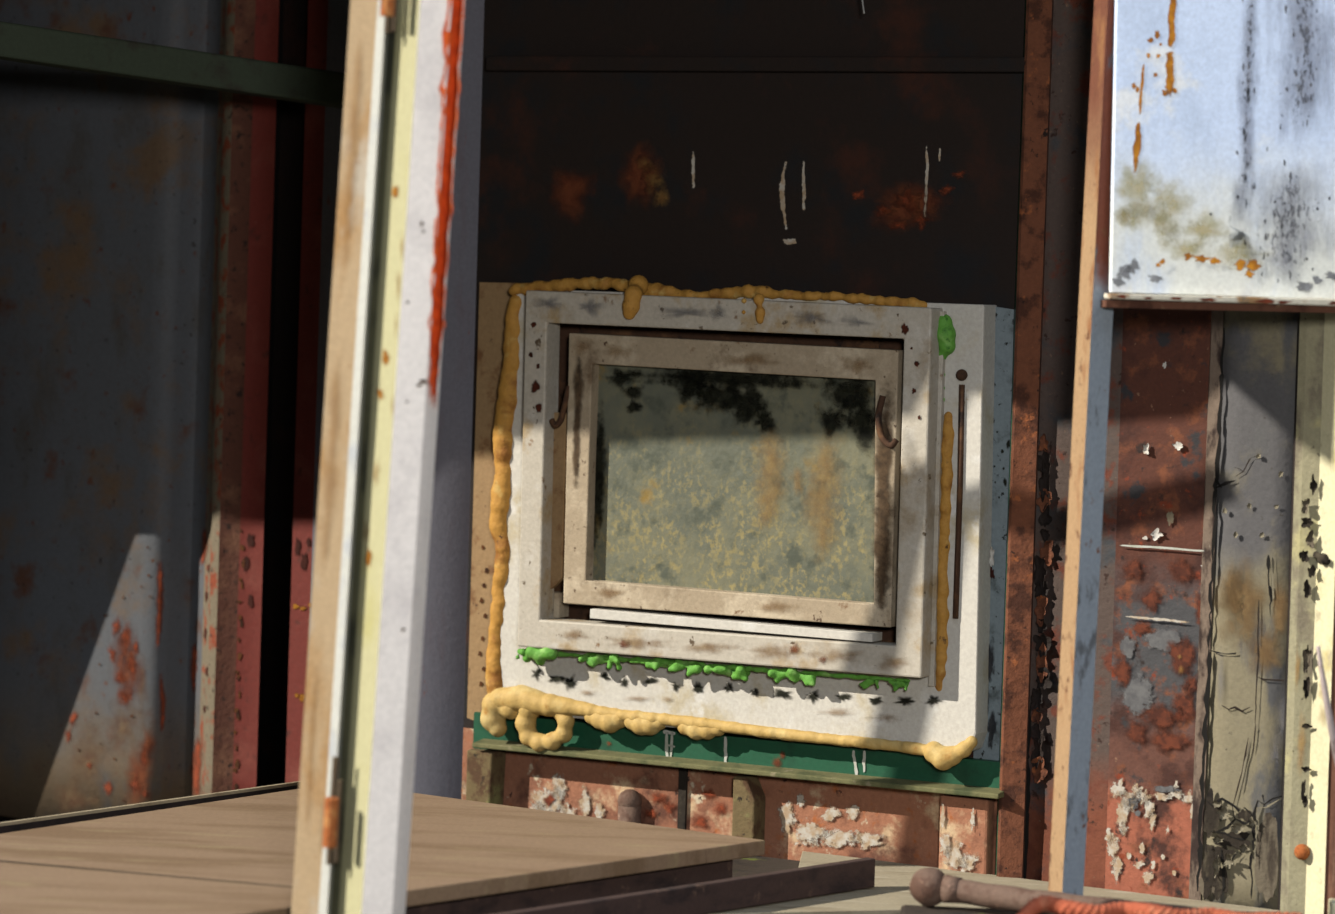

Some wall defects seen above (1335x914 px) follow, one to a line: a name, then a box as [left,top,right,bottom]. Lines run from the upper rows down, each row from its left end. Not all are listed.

corrosion [1132,0,1177,173]
leakage [1236,4,1255,206]
leakage [1285,0,1317,106]
corrosion [428,0,464,401]
leakage [1244,160,1330,282]
peeling [1299,474,1318,598]
corrosion [1127,638,1197,753]
corrosion [193,740,202,795]
peeling [530,773,605,818]
peeling [778,794,884,850]
peeling [940,804,979,872]
spalling [1105,779,1256,901]